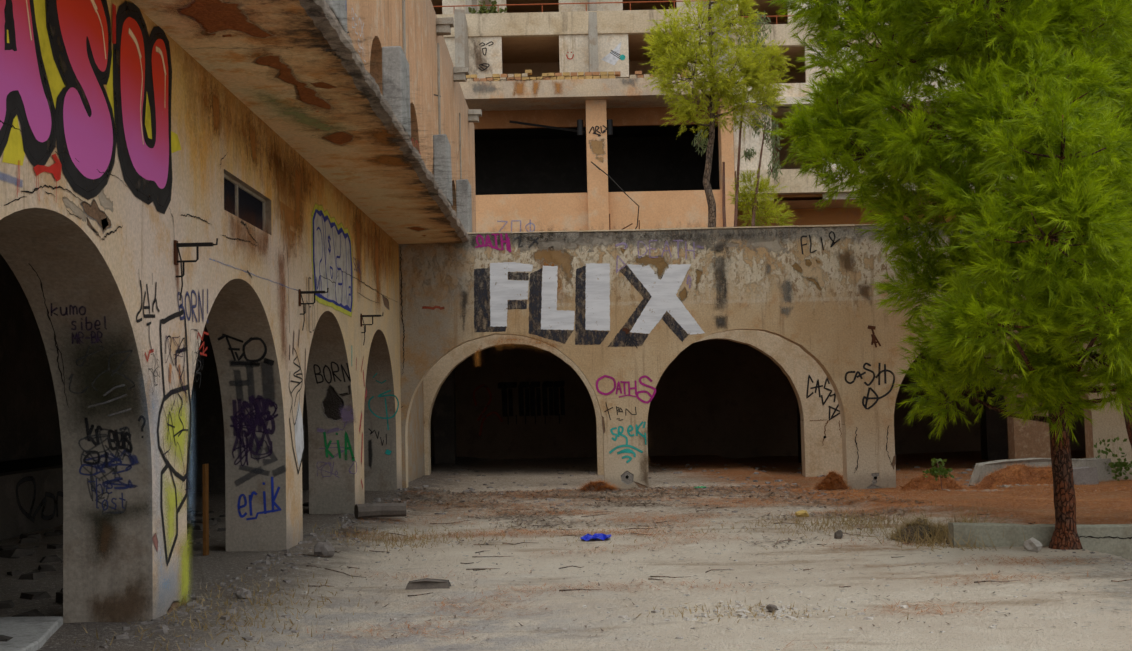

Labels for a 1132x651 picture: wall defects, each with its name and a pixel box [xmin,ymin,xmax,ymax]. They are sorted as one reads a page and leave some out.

spalling [173,0,337,113]
spalling [317,129,354,146]
leakage [201,77,313,251]
crack [5,184,122,240]
spalling [80,199,112,234]
leakage [353,215,393,301]
peeling [620,247,669,280]
peeling [678,269,703,303]
peeling [791,259,823,291]
crack [1079,533,1132,541]